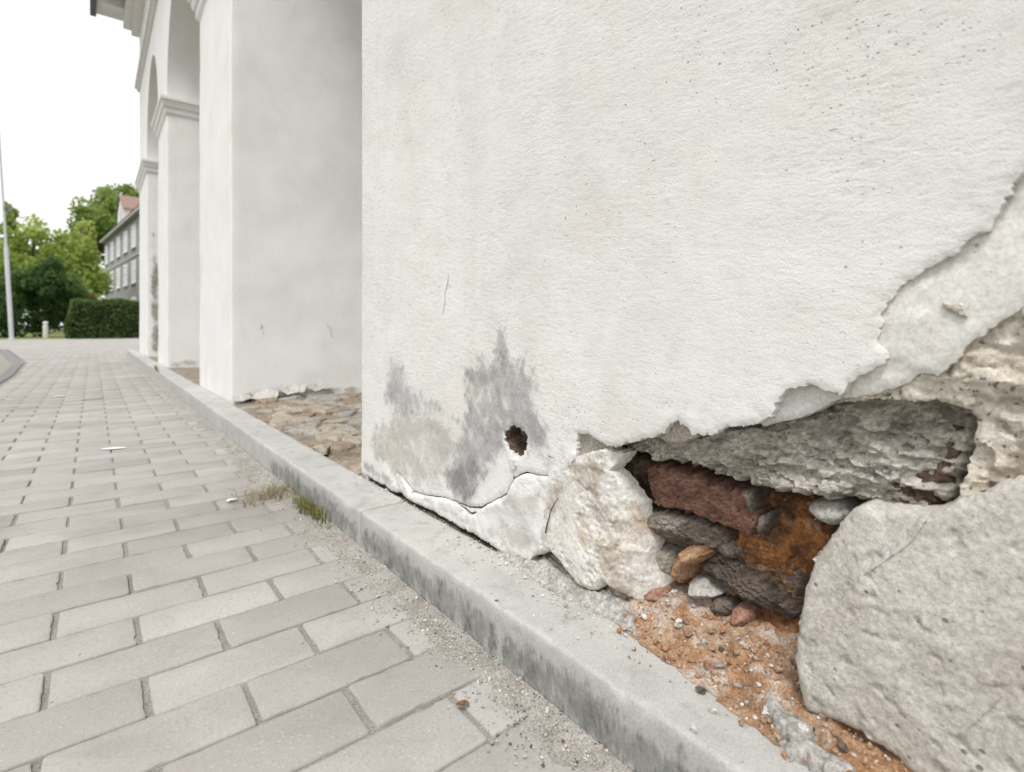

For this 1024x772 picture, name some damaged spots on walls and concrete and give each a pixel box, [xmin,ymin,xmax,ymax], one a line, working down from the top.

crack [410,456,558,534]
spalling [533,176,1024,633]